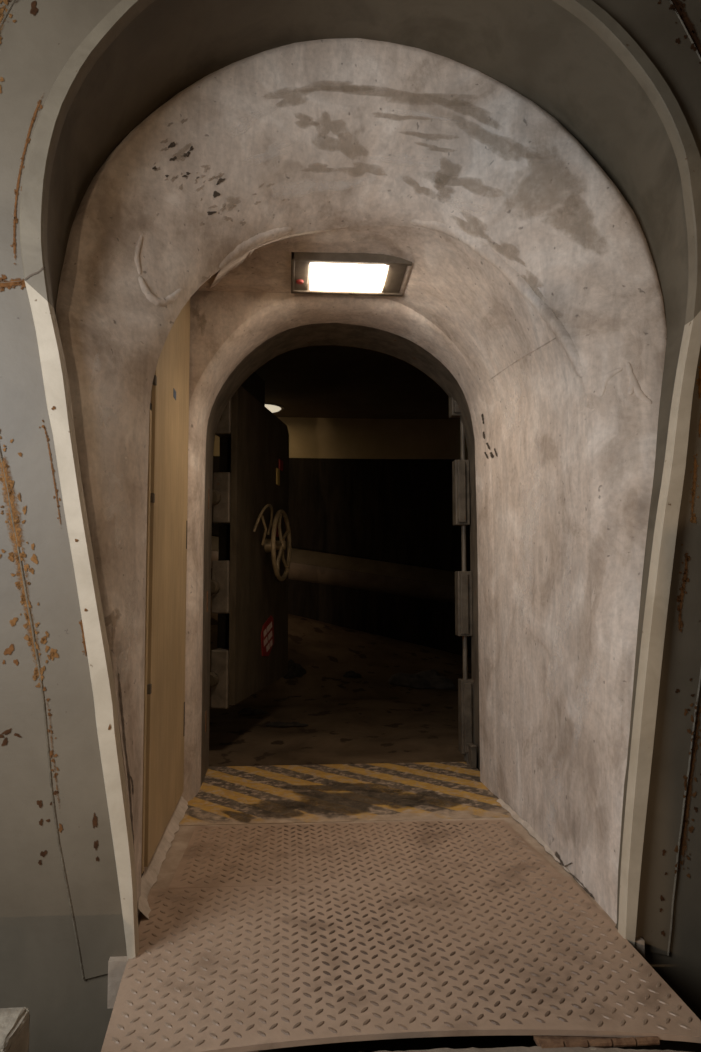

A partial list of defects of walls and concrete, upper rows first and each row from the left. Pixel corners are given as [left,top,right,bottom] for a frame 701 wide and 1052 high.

corrosion [657,0,701,64]
corrosion [0,274,26,292]
corrosion [39,420,61,524]
corrosion [0,436,63,833]
corrosion [662,689,701,878]